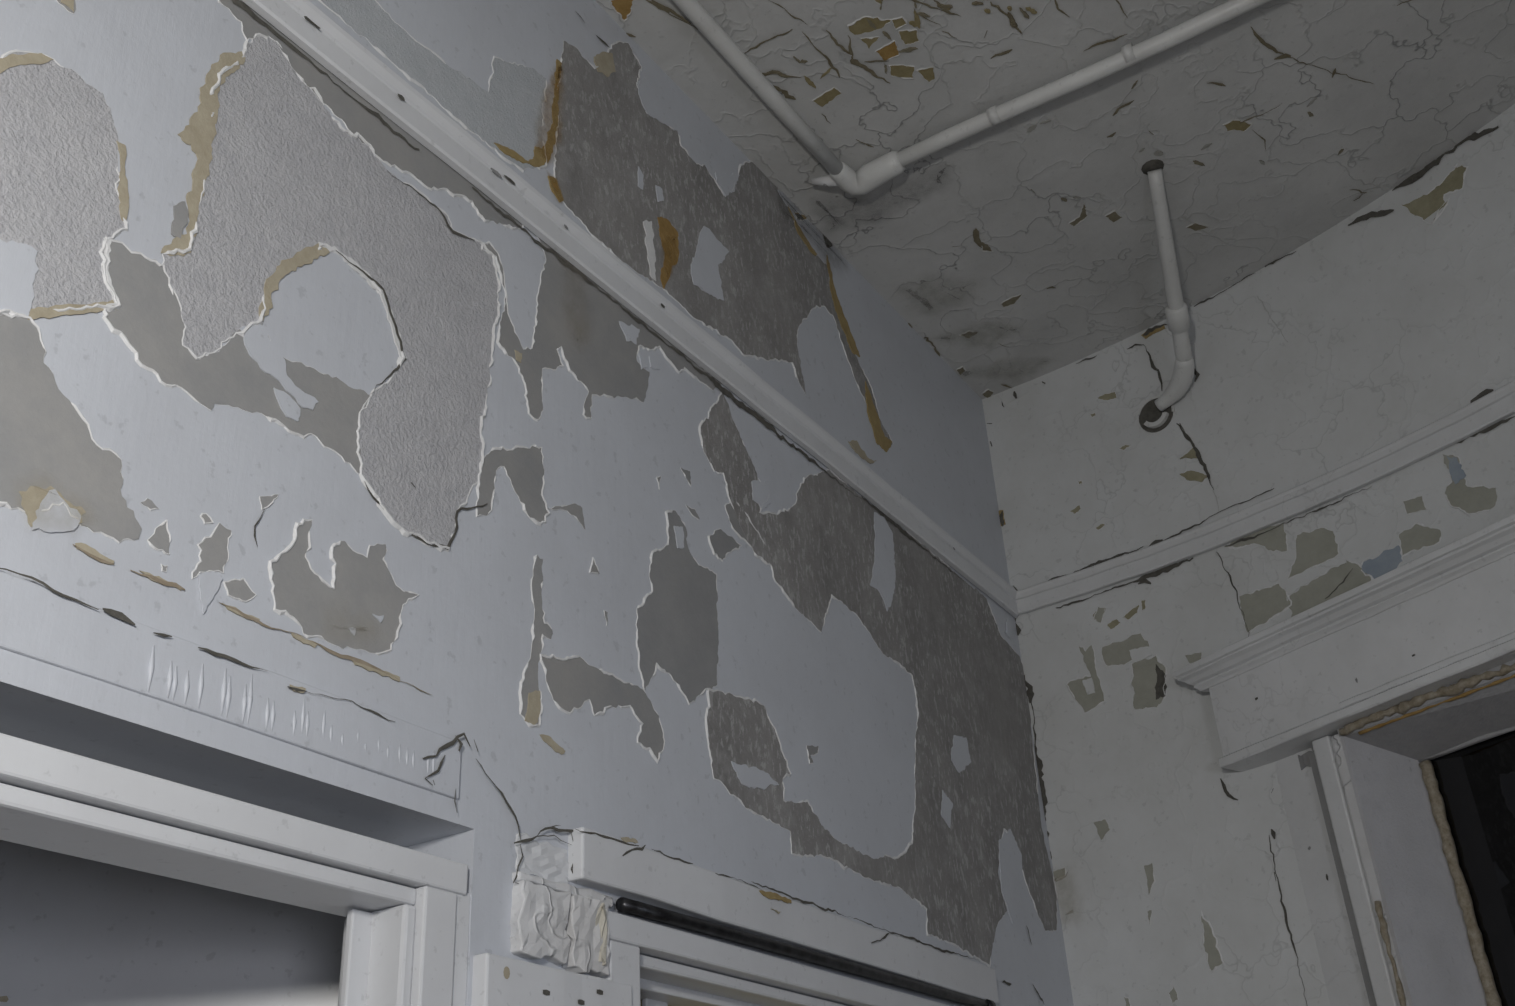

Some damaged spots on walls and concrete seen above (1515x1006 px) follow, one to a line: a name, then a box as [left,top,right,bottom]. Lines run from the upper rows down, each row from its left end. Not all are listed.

peeling [1251,27,1373,84]
peeling [1222,103,1282,165]
crack [1348,126,1499,226]
peeling [1401,163,1469,224]
spalling [1139,398,1173,433]
crack [1458,389,1515,443]
peeling [0,0,1066,967]
peeling [1443,454,1498,516]
peeling [1217,496,1442,637]
crack [0,543,431,722]
peeling [1066,599,1168,713]
crack [423,733,1044,1003]